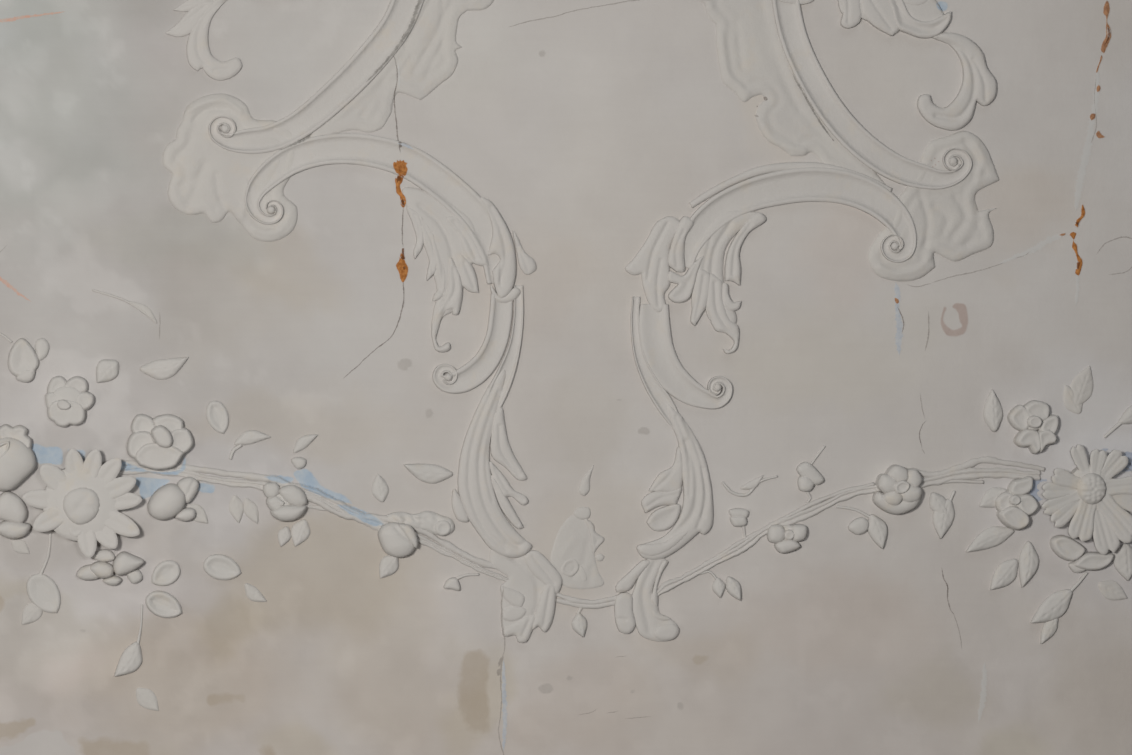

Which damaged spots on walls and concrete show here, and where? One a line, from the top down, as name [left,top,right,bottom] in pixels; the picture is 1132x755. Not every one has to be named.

crack [510,0,640,27]
rust [1096,0,1112,92]
rust [392,159,408,208]
crack [398,208,406,245]
rust [1059,204,1086,276]
rust [395,248,409,283]
crack [344,283,405,378]
leakage [940,302,969,337]
leakage [449,644,498,739]
crack [496,588,509,755]
leakage [0,714,42,746]
leakage [73,731,156,755]